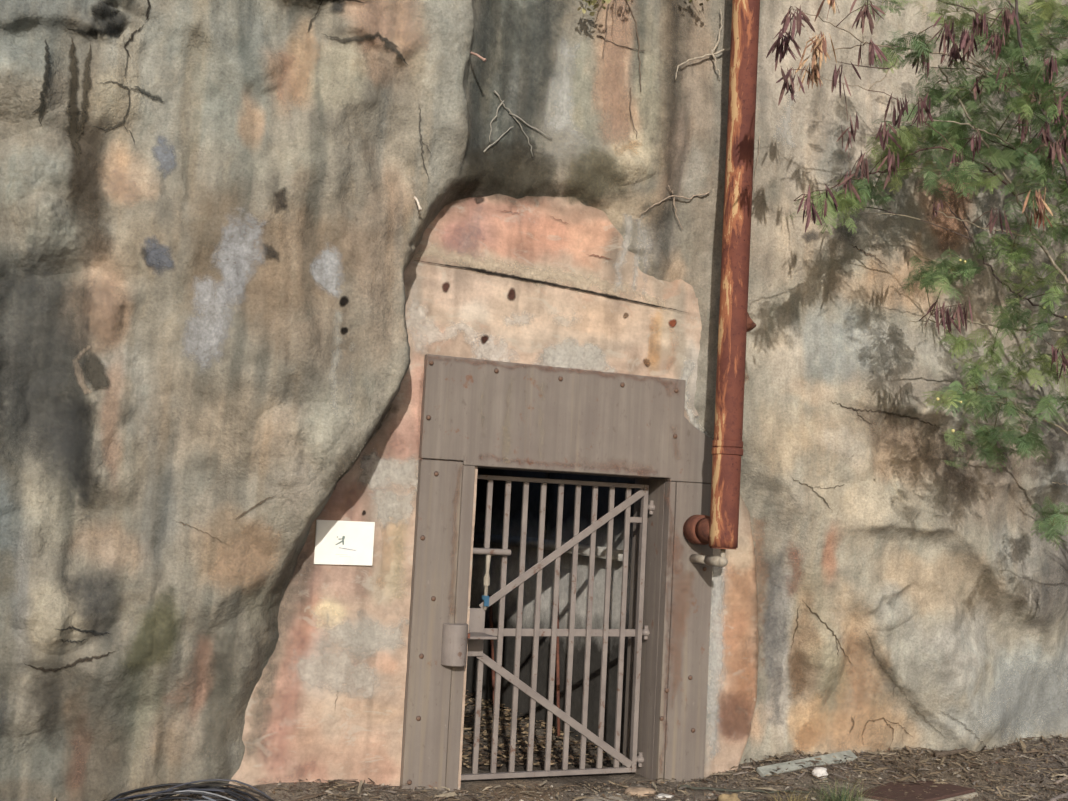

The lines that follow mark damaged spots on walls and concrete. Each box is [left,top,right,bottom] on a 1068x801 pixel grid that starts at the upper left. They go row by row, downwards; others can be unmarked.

crack [307,0,408,65]
crack [33,0,164,164]
water stain [459,0,583,202]
water stain [73,128,104,253]
crack [414,260,687,313]
crack [829,401,942,429]
crack [24,626,115,672]
crack [791,605,874,663]
crack [850,702,986,747]